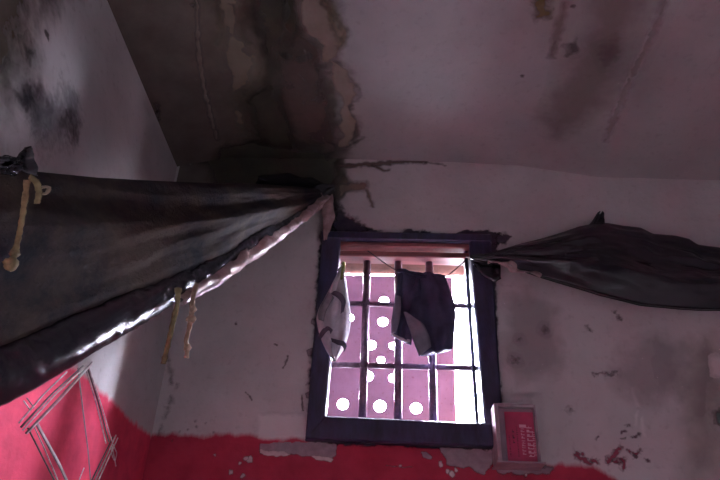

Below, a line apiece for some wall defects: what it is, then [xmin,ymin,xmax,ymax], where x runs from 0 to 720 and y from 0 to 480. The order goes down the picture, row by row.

leakage [0,0,57,89]
crack [338,160,441,172]
peeling [260,441,337,462]